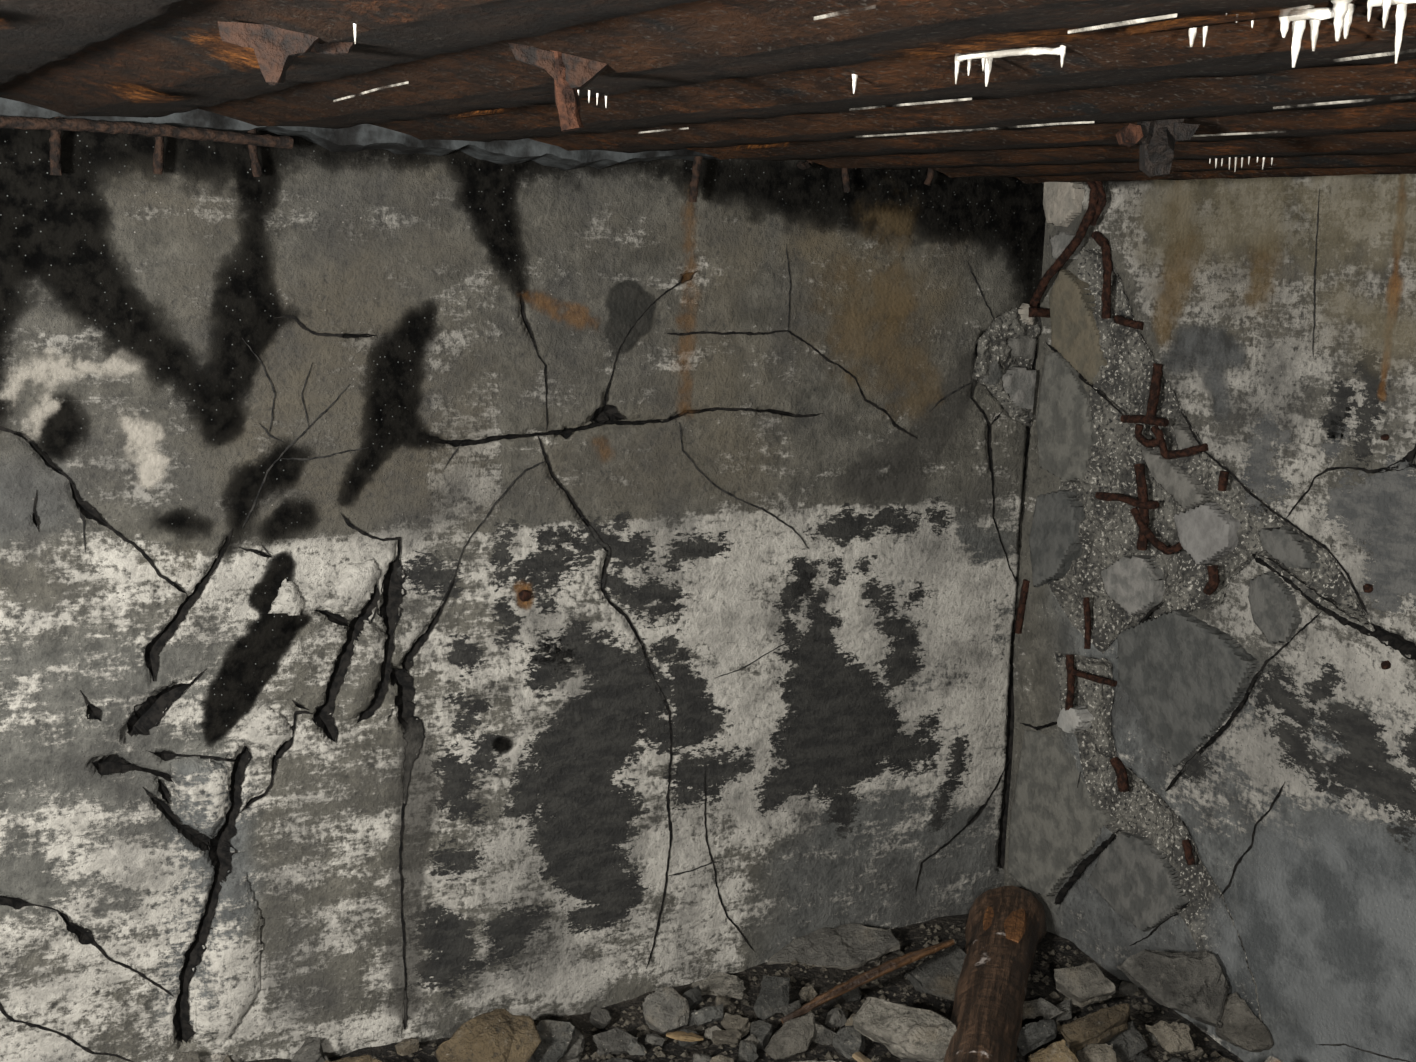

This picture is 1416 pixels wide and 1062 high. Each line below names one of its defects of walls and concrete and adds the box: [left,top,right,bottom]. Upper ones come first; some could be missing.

water stain [202,169,295,427]
water stain [1002,179,1046,308]
crack [1032,305,1123,415]
rust [1378,174,1406,399]
water stain [223,465,316,552]
water stain [493,737,513,753]
crack [0,244,1057,1044]
spalling [972,181,1416,1023]
crack [1165,412,1416,792]
crack [0,1003,133,1062]
crack [1054,831,1118,905]
water stain [1209,825,1416,1062]